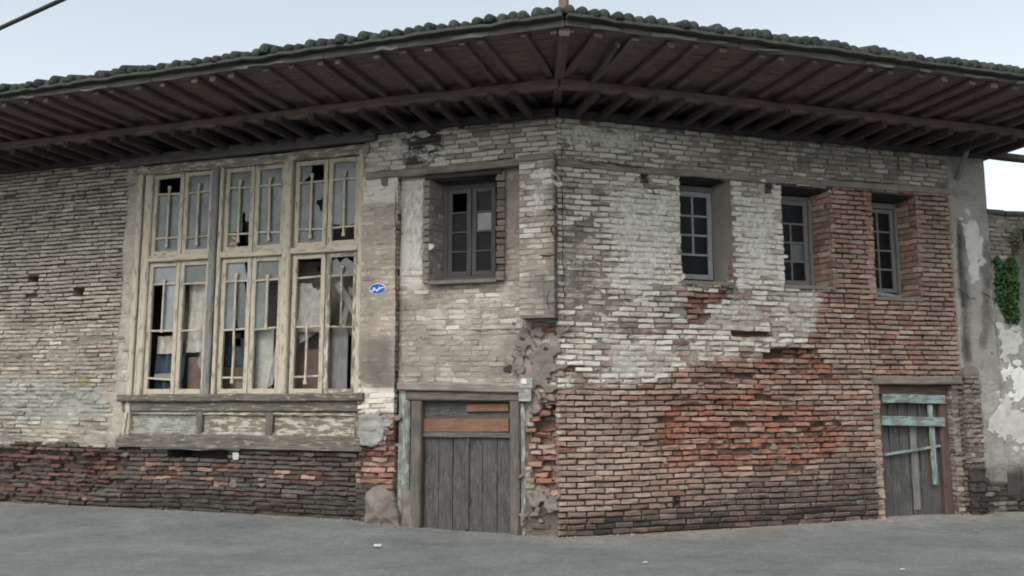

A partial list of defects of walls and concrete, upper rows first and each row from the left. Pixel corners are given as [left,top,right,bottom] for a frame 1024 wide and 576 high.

peeling [958,209,986,285]
spalling [504,322,585,527]
peeling [988,319,1024,453]